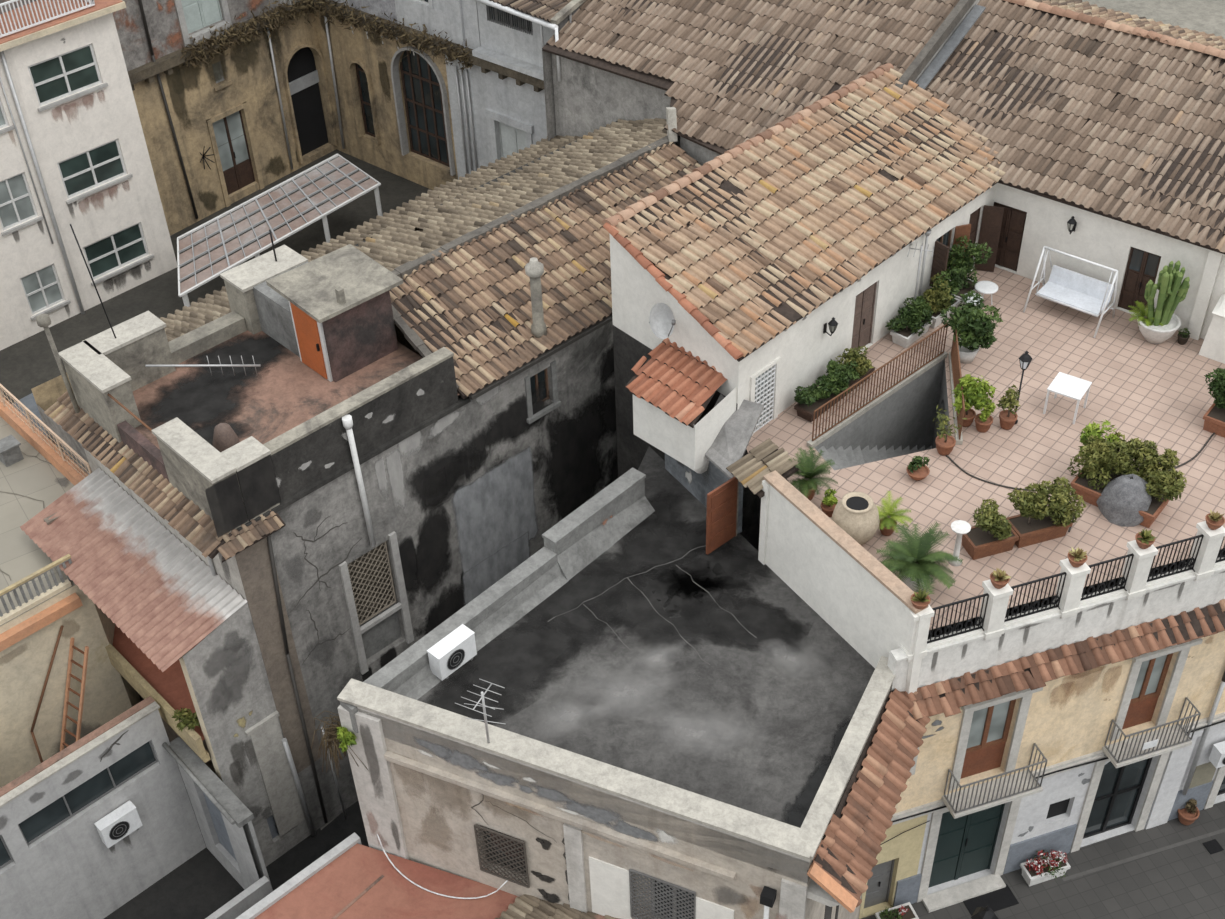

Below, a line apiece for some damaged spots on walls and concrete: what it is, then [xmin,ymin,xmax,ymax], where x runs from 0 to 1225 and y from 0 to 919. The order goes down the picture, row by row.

water stain [375,345,618,635]
water stain [206,632,250,710]
water stain [342,647,397,690]
water stain [429,495,800,724]
crack [548,545,757,665]
peeling [415,738,674,843]